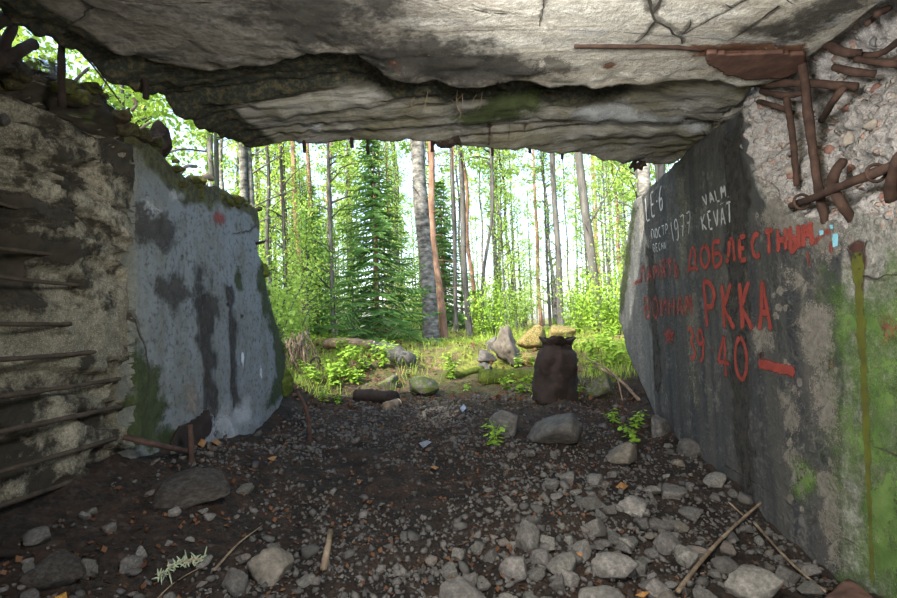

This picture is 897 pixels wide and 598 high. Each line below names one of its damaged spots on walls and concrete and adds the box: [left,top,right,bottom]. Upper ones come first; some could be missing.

crack [634,0,793,44]
corrosion [691,42,808,57]
spalling [141,77,150,100]
spalling [150,119,172,158]
spalling [0,45,135,508]
spalling [740,0,897,579]
damp [155,267,249,435]